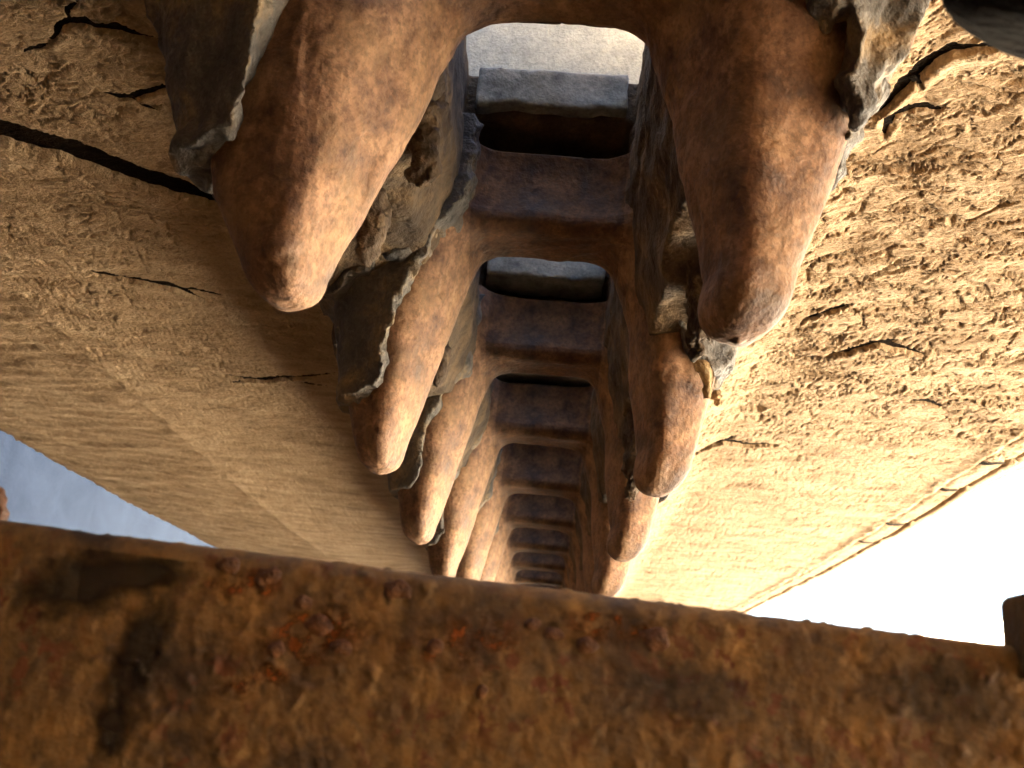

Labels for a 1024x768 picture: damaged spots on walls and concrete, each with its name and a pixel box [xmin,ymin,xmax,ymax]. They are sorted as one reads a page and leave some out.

crack [23,1,158,52]
crack [104,83,166,110]
crack [877,42,990,134]
crack [0,120,214,200]
crack [91,270,221,299]
crack [799,338,922,357]
crack [227,372,335,386]
crack [700,435,765,450]
corrosion [205,557,282,598]
corrosion [256,594,360,661]